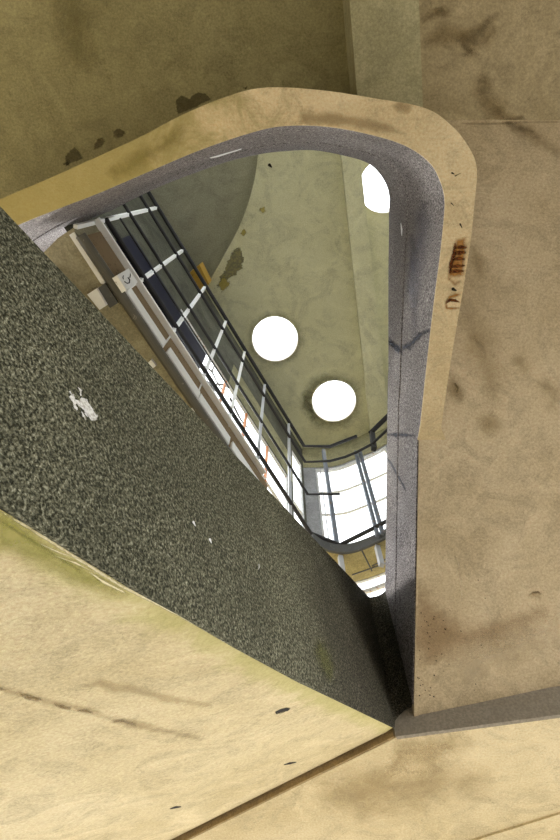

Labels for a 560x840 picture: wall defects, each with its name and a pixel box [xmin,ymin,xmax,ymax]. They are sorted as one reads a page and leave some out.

corrosion [446,239,467,309]
peeling [69,387,98,421]